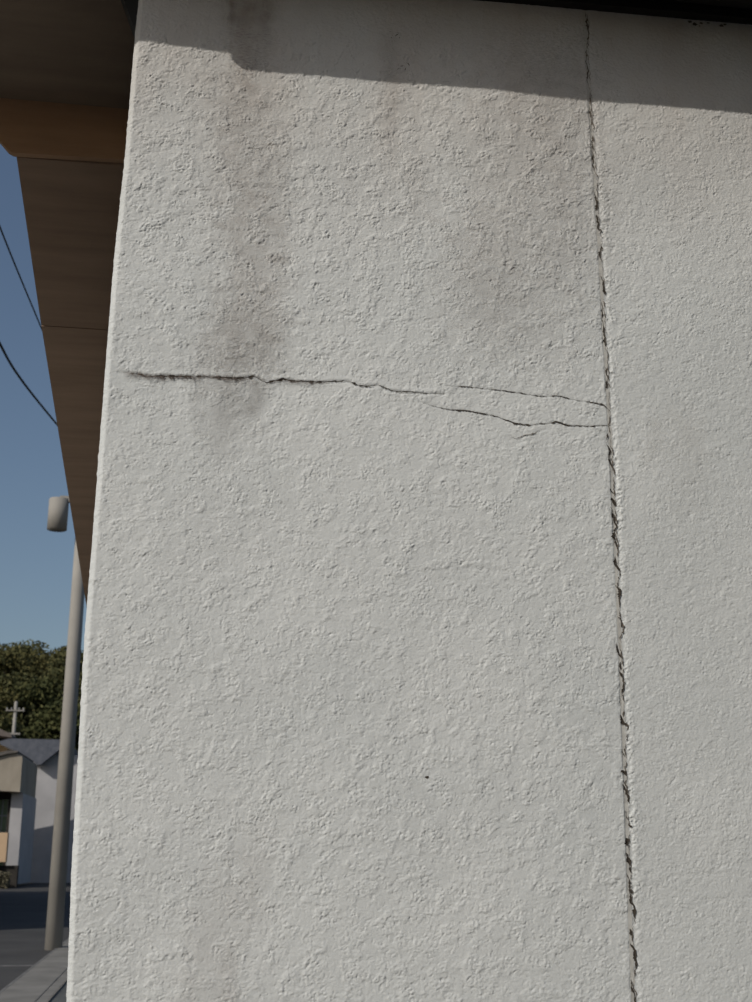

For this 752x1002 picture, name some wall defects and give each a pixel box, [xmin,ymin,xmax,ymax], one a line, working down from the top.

water stain [129,372,236,380]
crack [123,12,638,1002]